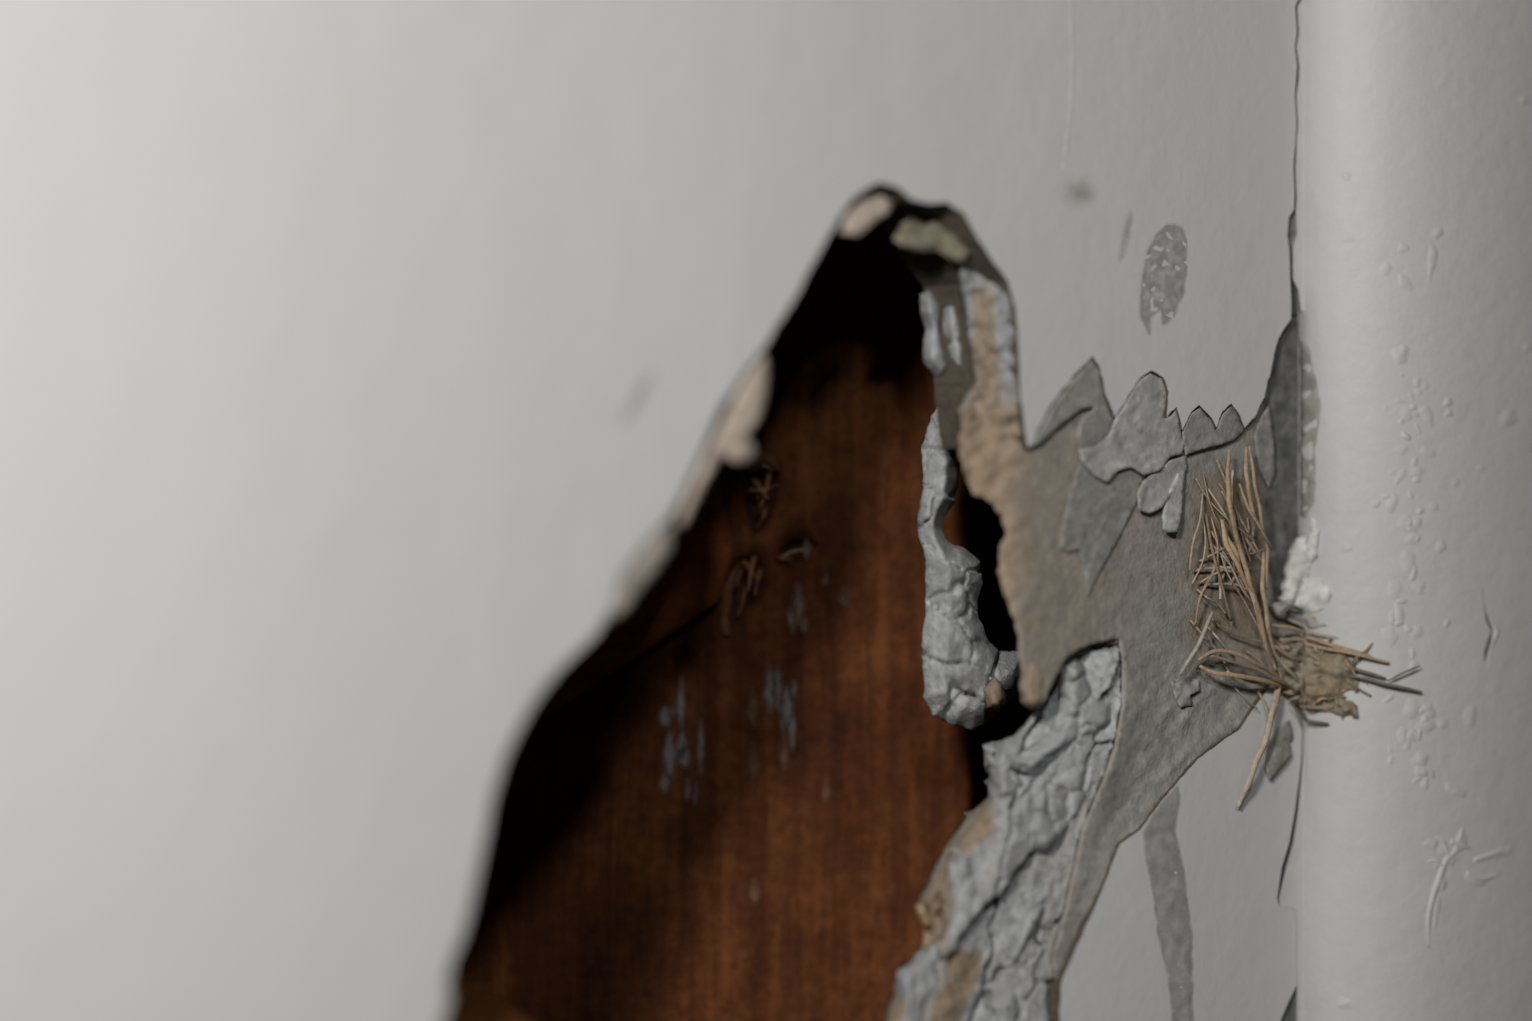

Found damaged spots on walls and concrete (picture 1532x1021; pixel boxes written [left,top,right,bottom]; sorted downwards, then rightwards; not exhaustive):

peeling [483,194,1332,1021]
crack [1287,212,1299,316]